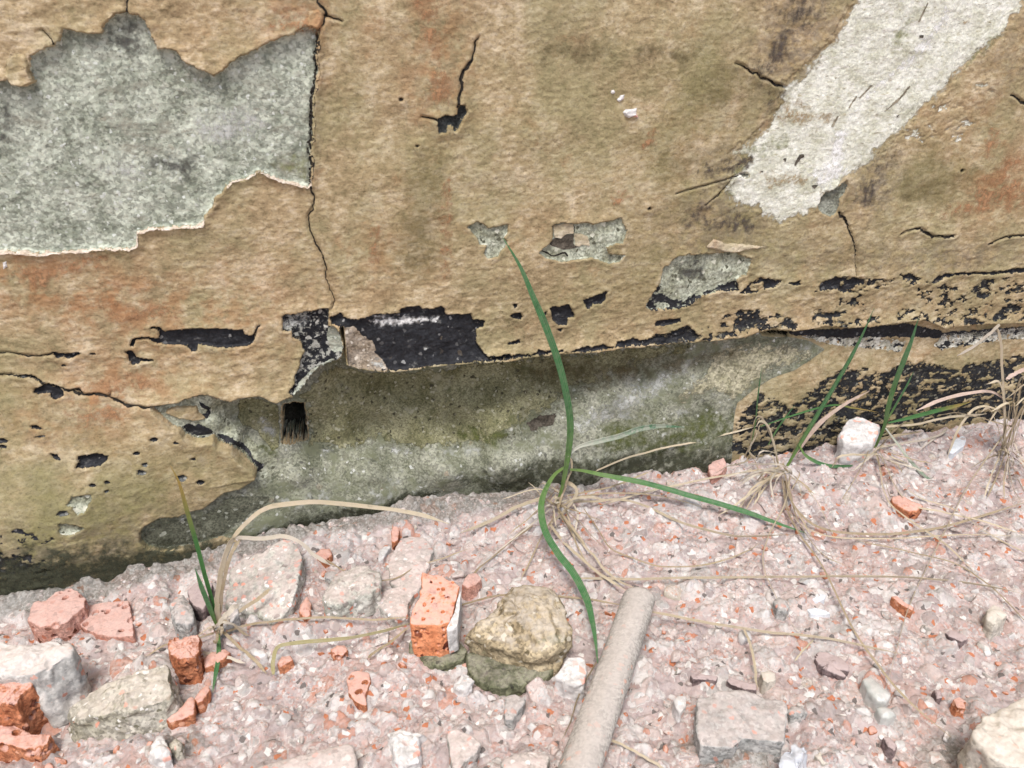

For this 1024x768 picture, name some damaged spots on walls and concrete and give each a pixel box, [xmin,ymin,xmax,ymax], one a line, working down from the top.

crack [422,37,479,121]
crack [736,63,785,87]
peeling [0,9,324,257]
crack [306,0,342,309]
peeling [726,0,1022,224]
peeling [468,222,508,258]
peeling [539,218,627,264]
crack [838,212,856,267]
crack [901,227,954,239]
crack [0,351,155,409]
spalling [126,239,1024,550]